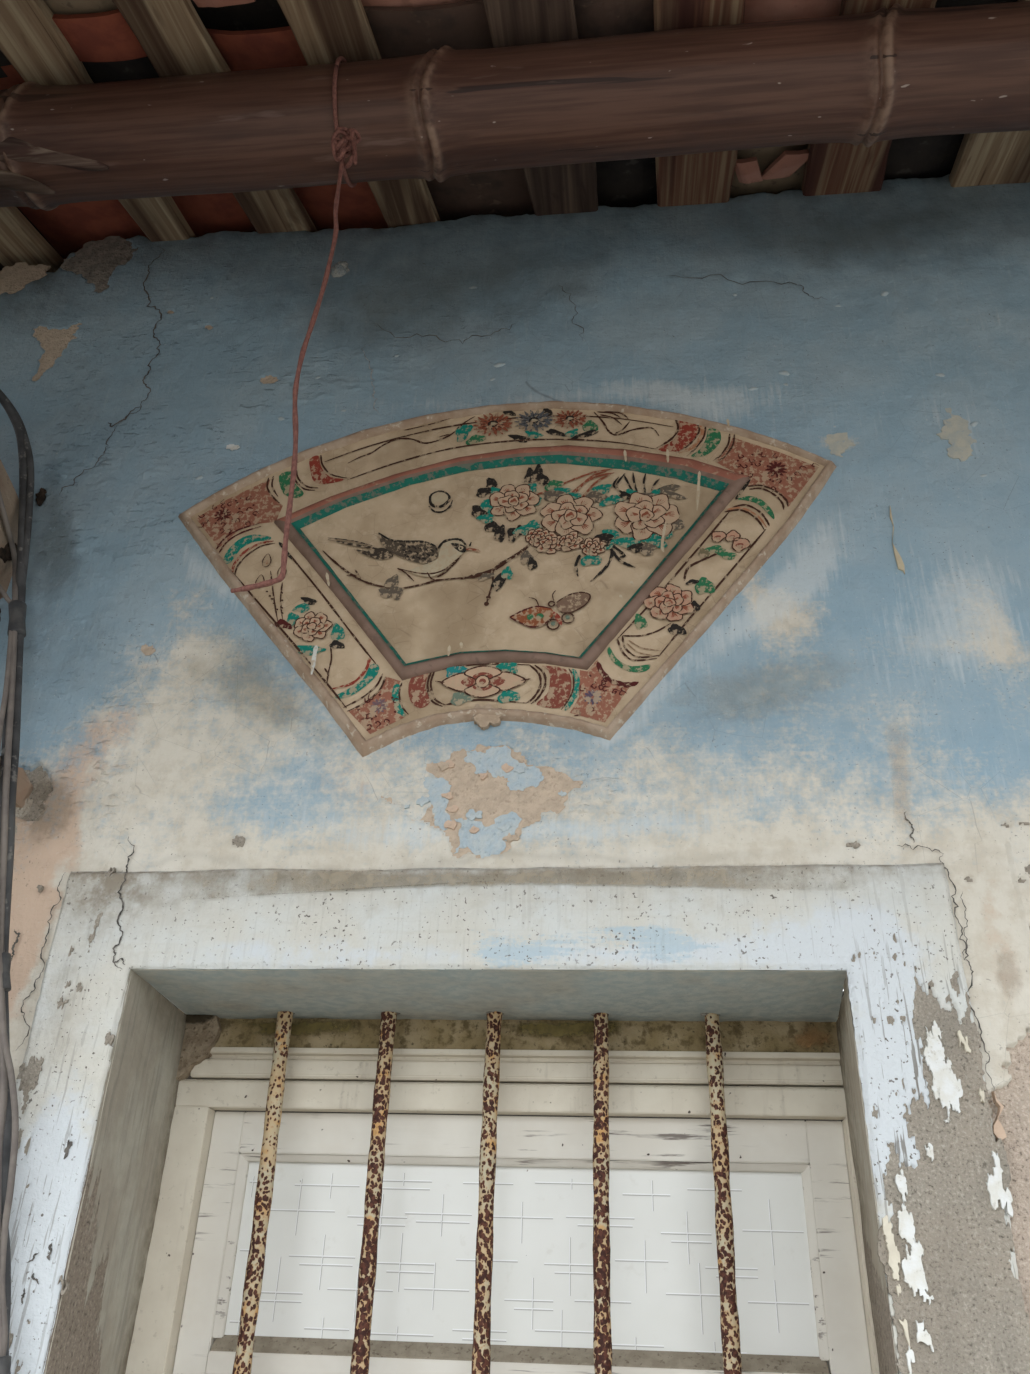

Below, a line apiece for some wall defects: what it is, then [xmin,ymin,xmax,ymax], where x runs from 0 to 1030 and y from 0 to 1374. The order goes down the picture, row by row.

flaking render [0,236,139,295]
flaking render [32,323,82,381]
crack [61,244,165,491]
peeling [936,408,977,462]
flaking render [381,744,583,858]
crack [112,837,135,969]
crack [897,812,995,1088]
peeling [16,1055,44,1155]
peeling [851,933,1030,1374]